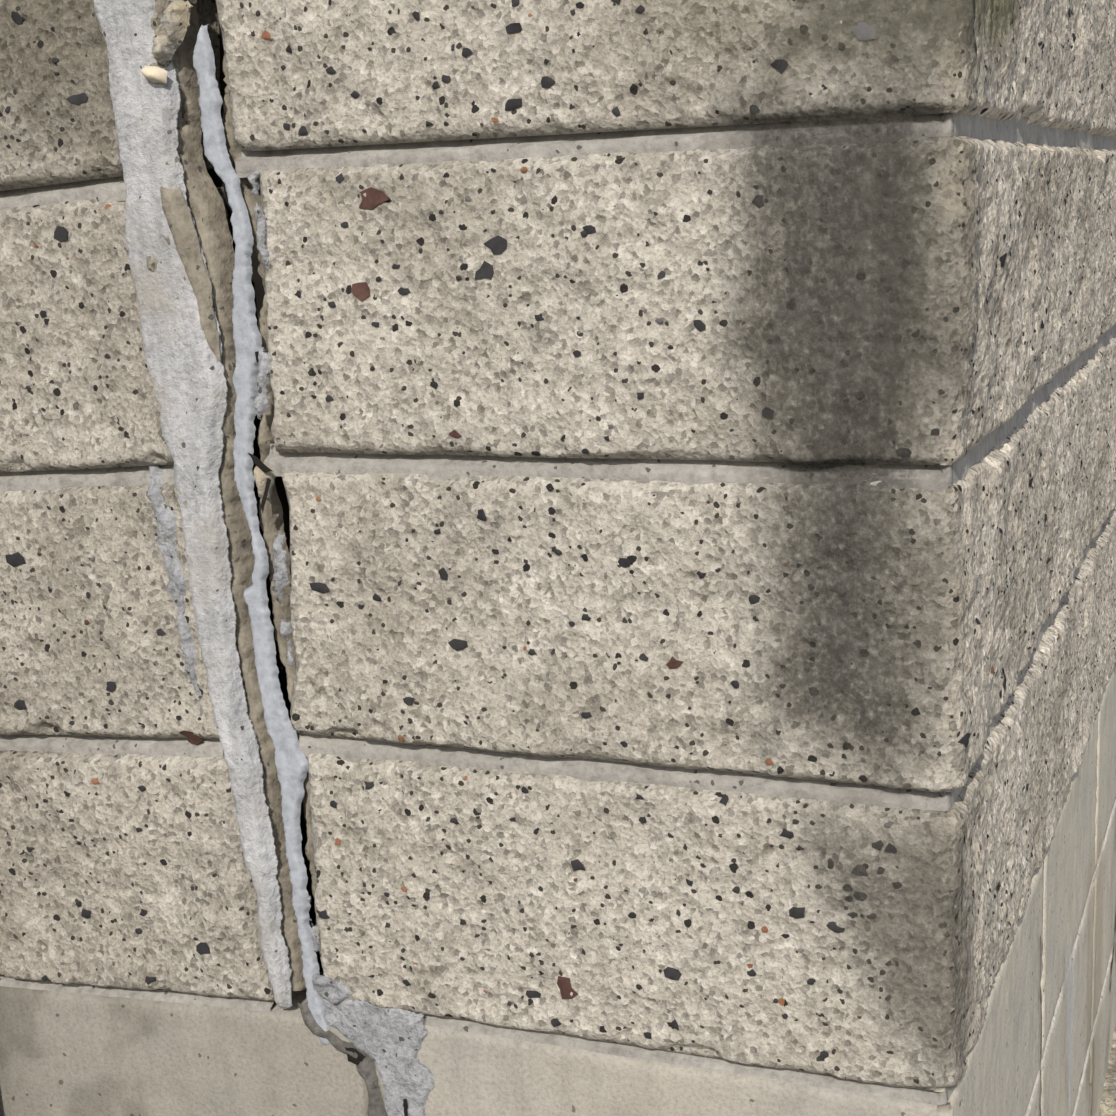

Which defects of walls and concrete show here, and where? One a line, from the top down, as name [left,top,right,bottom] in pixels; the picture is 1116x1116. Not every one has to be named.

crack [176,0,324,991]
damp [740,91,926,751]
crack [345,1047,365,1065]
crack [401,1099,409,1116]
damp [835,848,968,1046]
crack [1037,936,1045,1116]